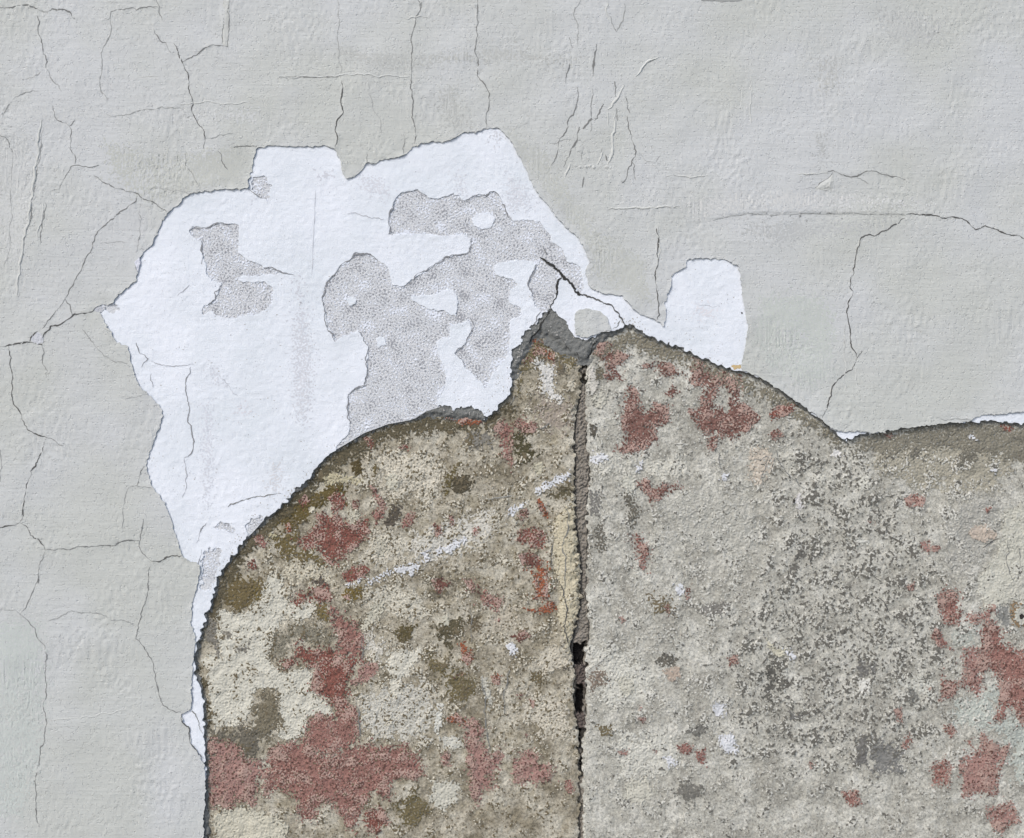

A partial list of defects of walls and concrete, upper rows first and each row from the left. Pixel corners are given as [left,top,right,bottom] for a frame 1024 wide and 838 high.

crack [279,3,344,146]
crack [368,0,422,153]
crack [474,0,490,124]
crack [806,170,905,189]
crack [529,311,597,359]
crack [653,229,661,319]
crack [822,213,1024,418]
crack [0,1,257,823]
peeling [94,127,758,778]
peeling [830,428,879,441]
peeling [963,412,1024,425]
crack [550,394,590,769]